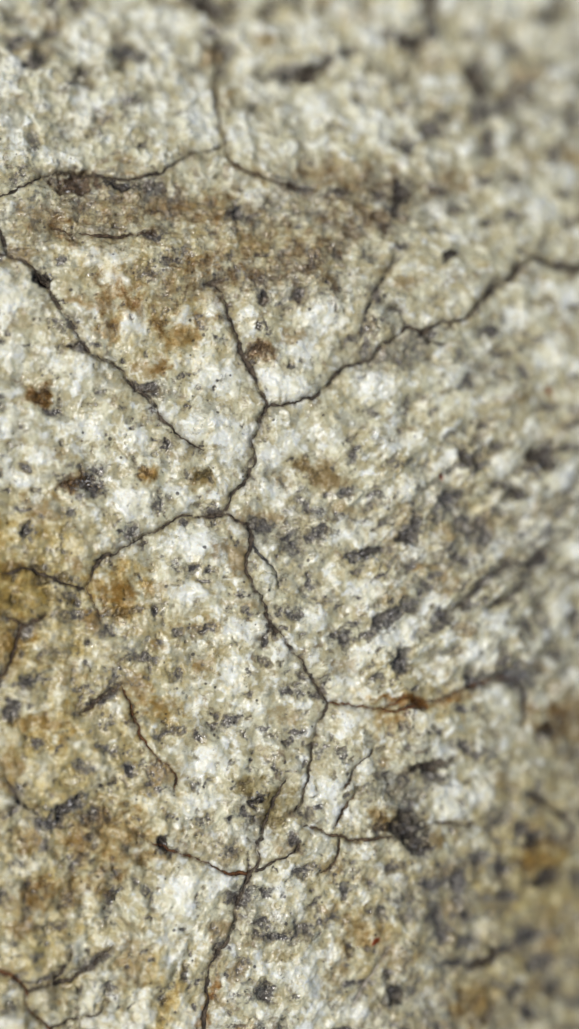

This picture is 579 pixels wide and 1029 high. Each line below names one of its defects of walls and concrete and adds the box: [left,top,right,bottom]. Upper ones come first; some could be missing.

crack [0,40,299,197]
crack [0,228,576,1029]